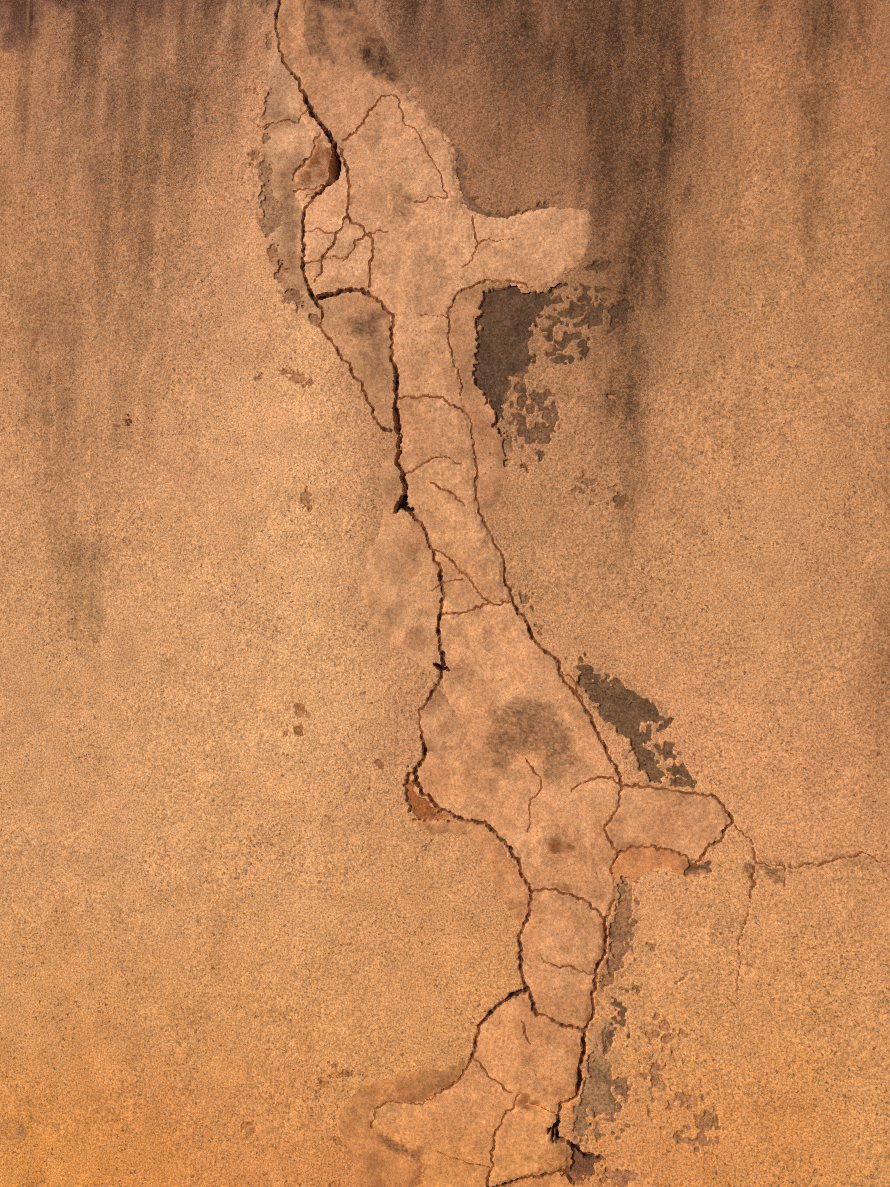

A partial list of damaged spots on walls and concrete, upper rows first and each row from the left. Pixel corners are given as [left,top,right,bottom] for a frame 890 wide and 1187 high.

flaking render [246,89,320,327]
flaking render [453,144,550,219]
flaking render [281,368,315,388]
flaking render [473,260,635,473]
flaking render [301,487,313,512]
flaking render [572,470,630,509]
crack [258,0,890,1187]
flaking render [284,703,311,737]
flaking render [571,653,697,789]
flaking render [404,772,450,822]
flaking render [684,860,712,875]
flaking render [567,876,725,1187]